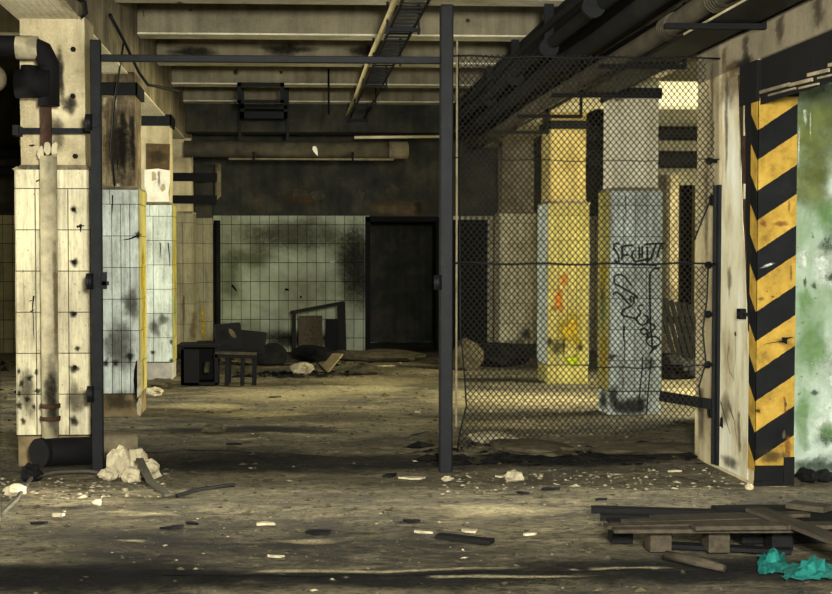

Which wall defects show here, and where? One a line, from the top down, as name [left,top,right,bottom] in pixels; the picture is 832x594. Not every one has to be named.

damp [816,237,832,279]
damp [818,421,832,444]
damp [796,459,832,472]